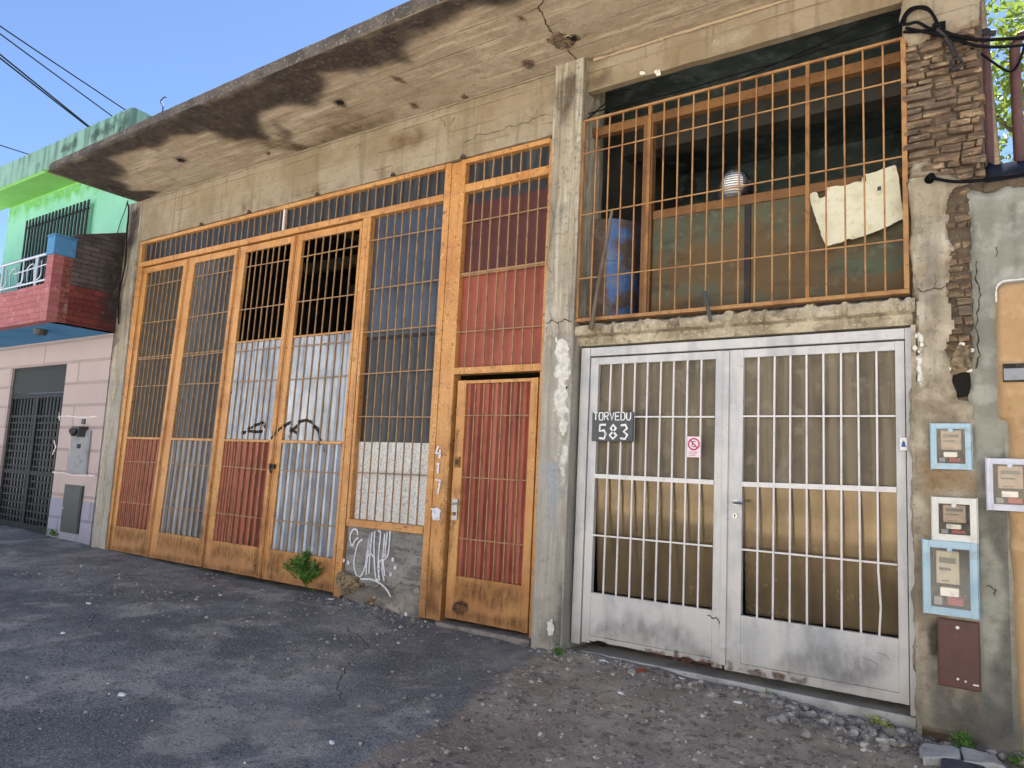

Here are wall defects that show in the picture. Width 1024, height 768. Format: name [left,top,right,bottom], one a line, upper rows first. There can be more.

water stain [45,0,516,253]
crack [440,101,546,143]
crack [524,0,588,60]
spalling [945,187,975,398]